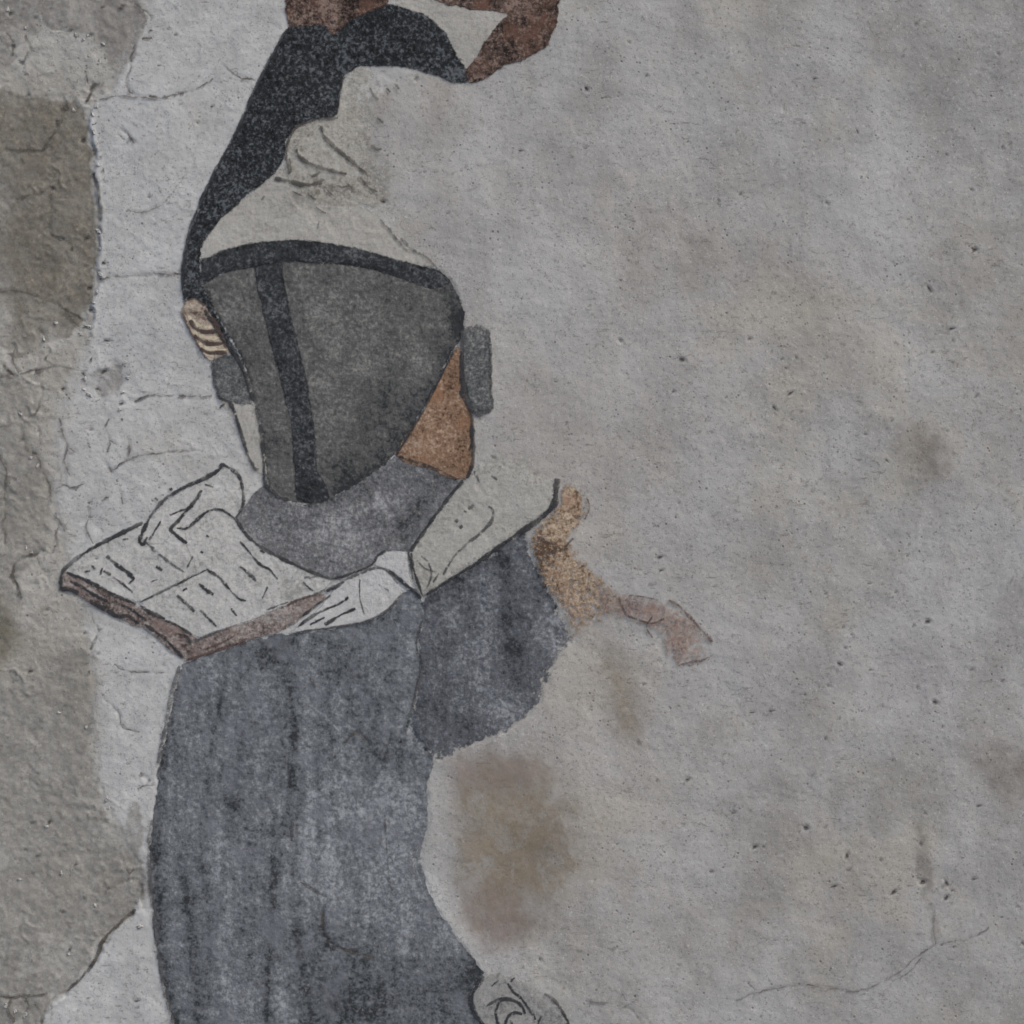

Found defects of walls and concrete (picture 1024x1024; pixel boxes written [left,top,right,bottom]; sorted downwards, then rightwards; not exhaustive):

crack [18,4,252,153]
crack [92,151,154,220]
spalling [0,94,110,362]
crack [0,289,87,328]
crack [1,328,50,378]
crack [134,394,212,402]
crack [106,418,159,472]
crack [0,406,93,600]
crack [738,910,950,1000]